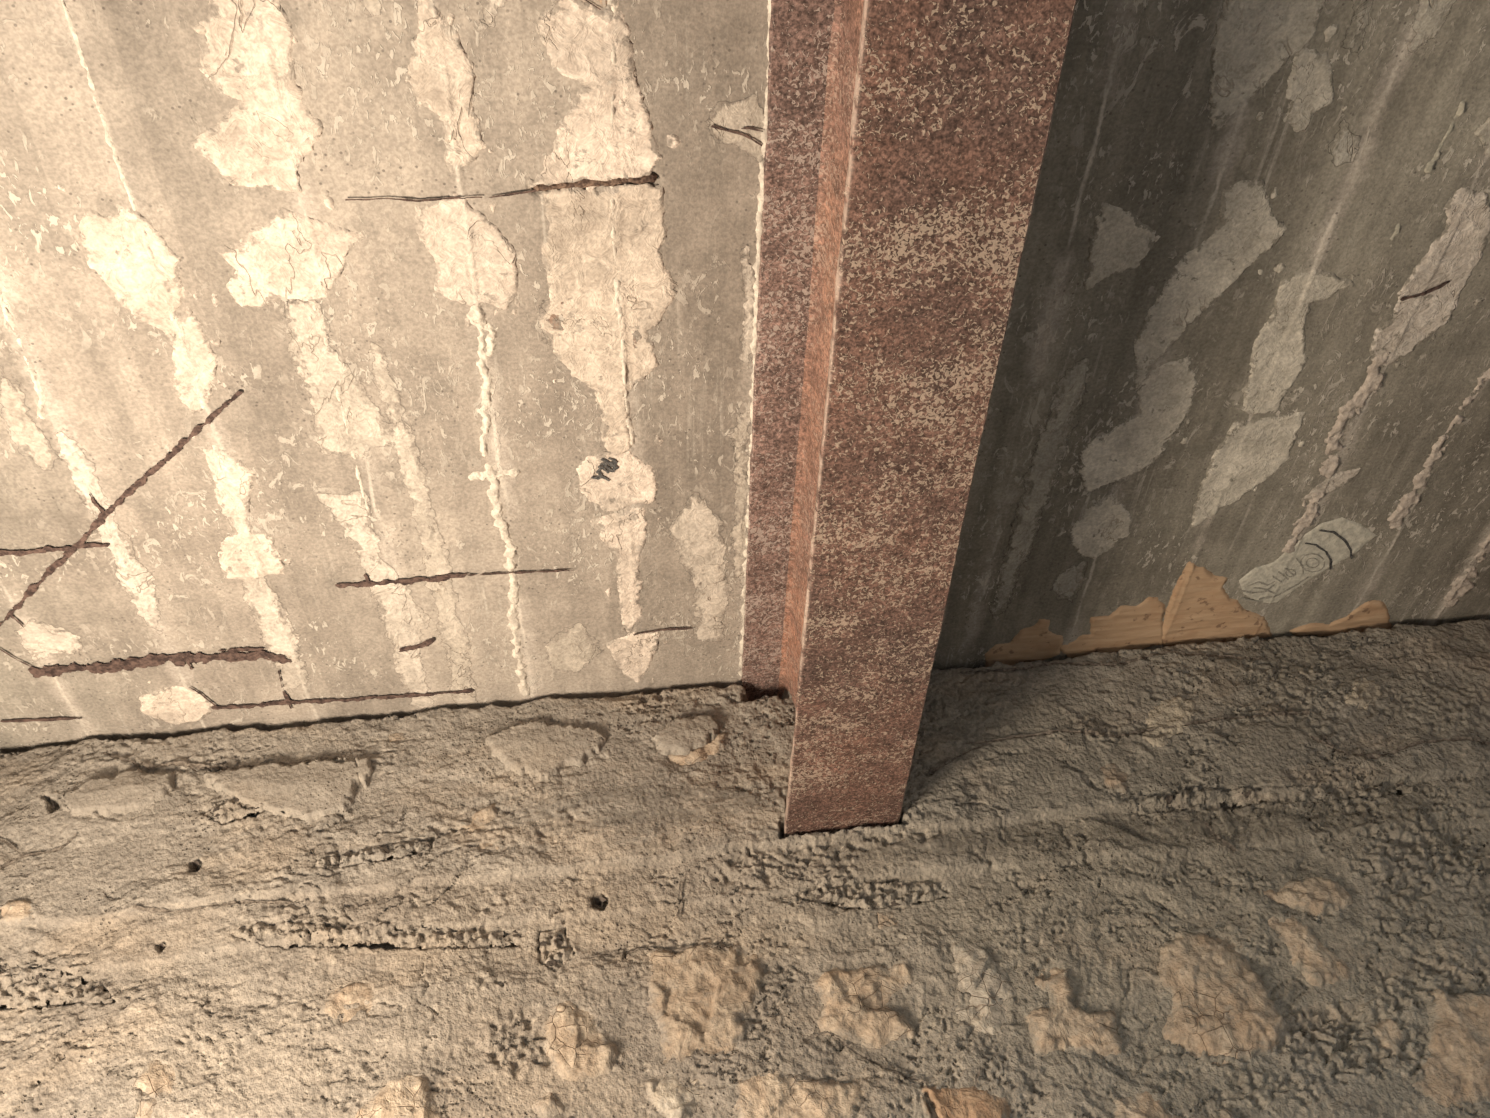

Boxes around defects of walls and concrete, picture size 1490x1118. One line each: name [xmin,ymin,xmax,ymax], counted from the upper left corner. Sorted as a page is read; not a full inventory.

peeling [0,366,162,634]
crack [0,391,473,710]
spalling [78,0,481,710]
crack [345,190,536,202]
crack [335,570,573,588]
spalling [405,0,520,327]
spalling [528,0,751,683]
spalling [989,171,1361,618]
spalling [1208,0,1361,166]
spalling [1347,186,1490,368]
crack [0,716,82,724]
flaking render [642,940,866,1118]